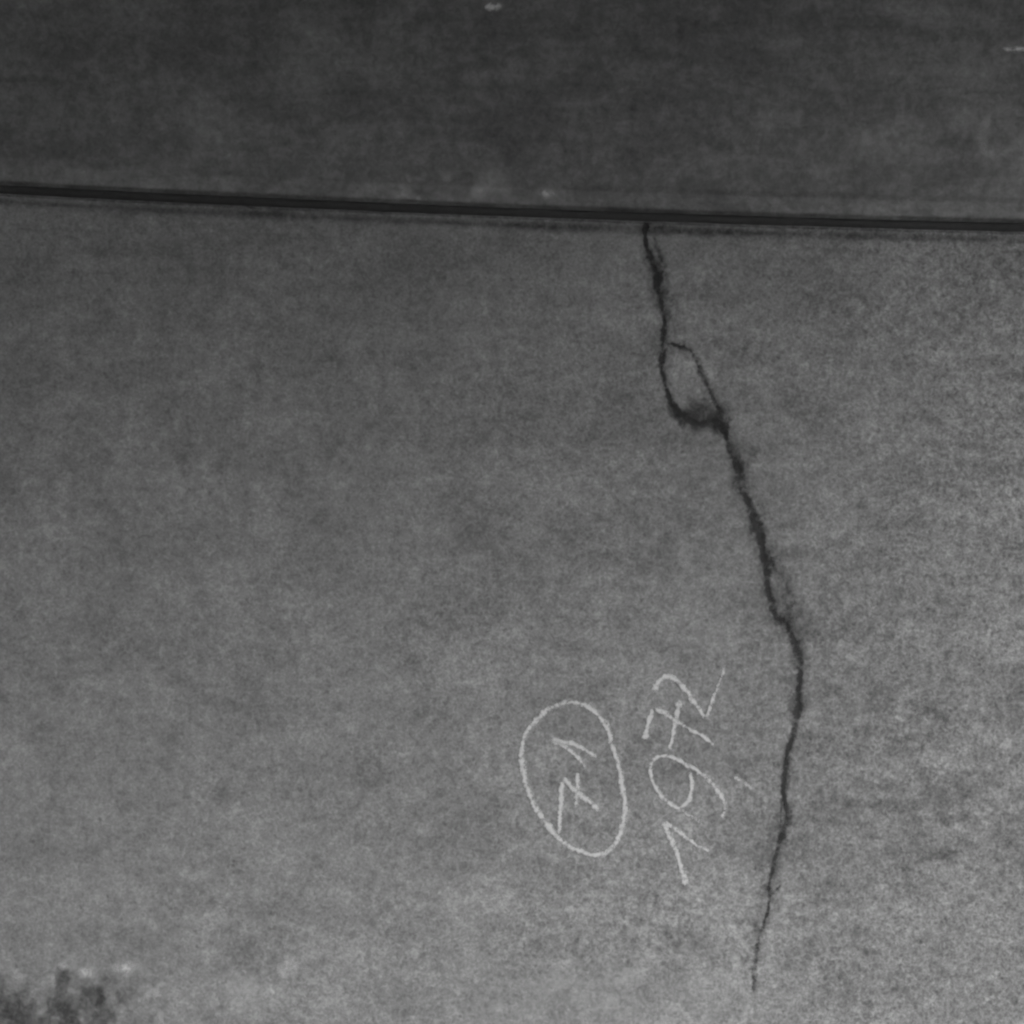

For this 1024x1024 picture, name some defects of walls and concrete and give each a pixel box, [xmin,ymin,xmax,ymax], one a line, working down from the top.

crack [642,223,806,990]